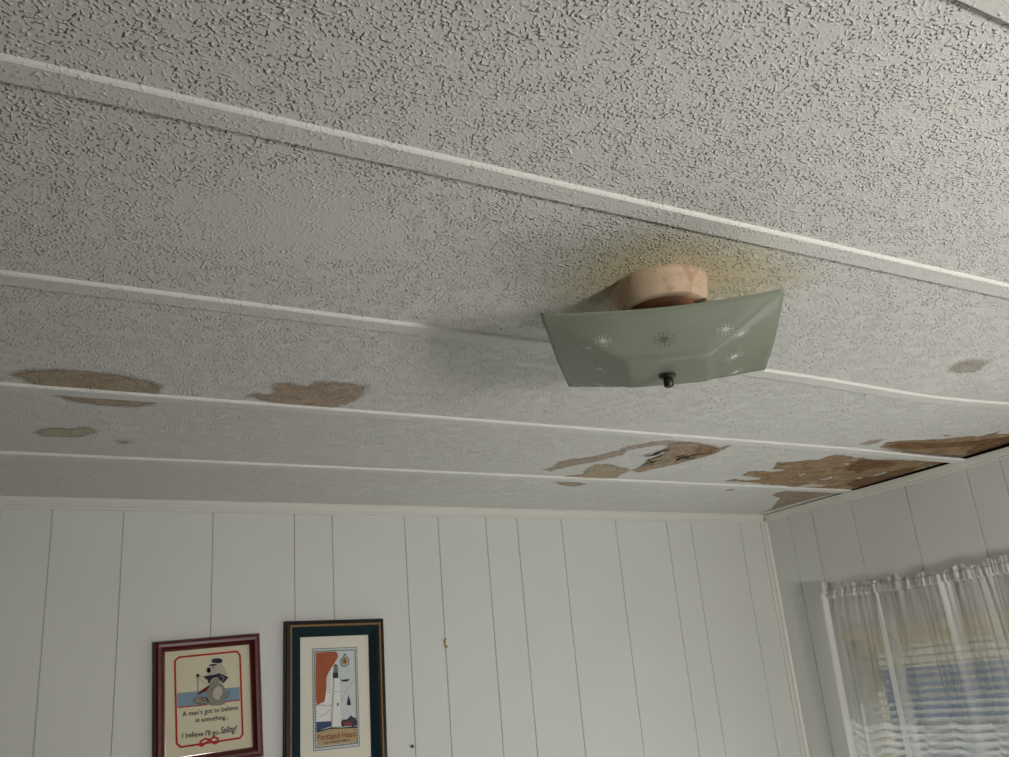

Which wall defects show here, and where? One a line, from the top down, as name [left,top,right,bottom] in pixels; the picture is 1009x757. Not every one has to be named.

peeling [728,431,1009,513]